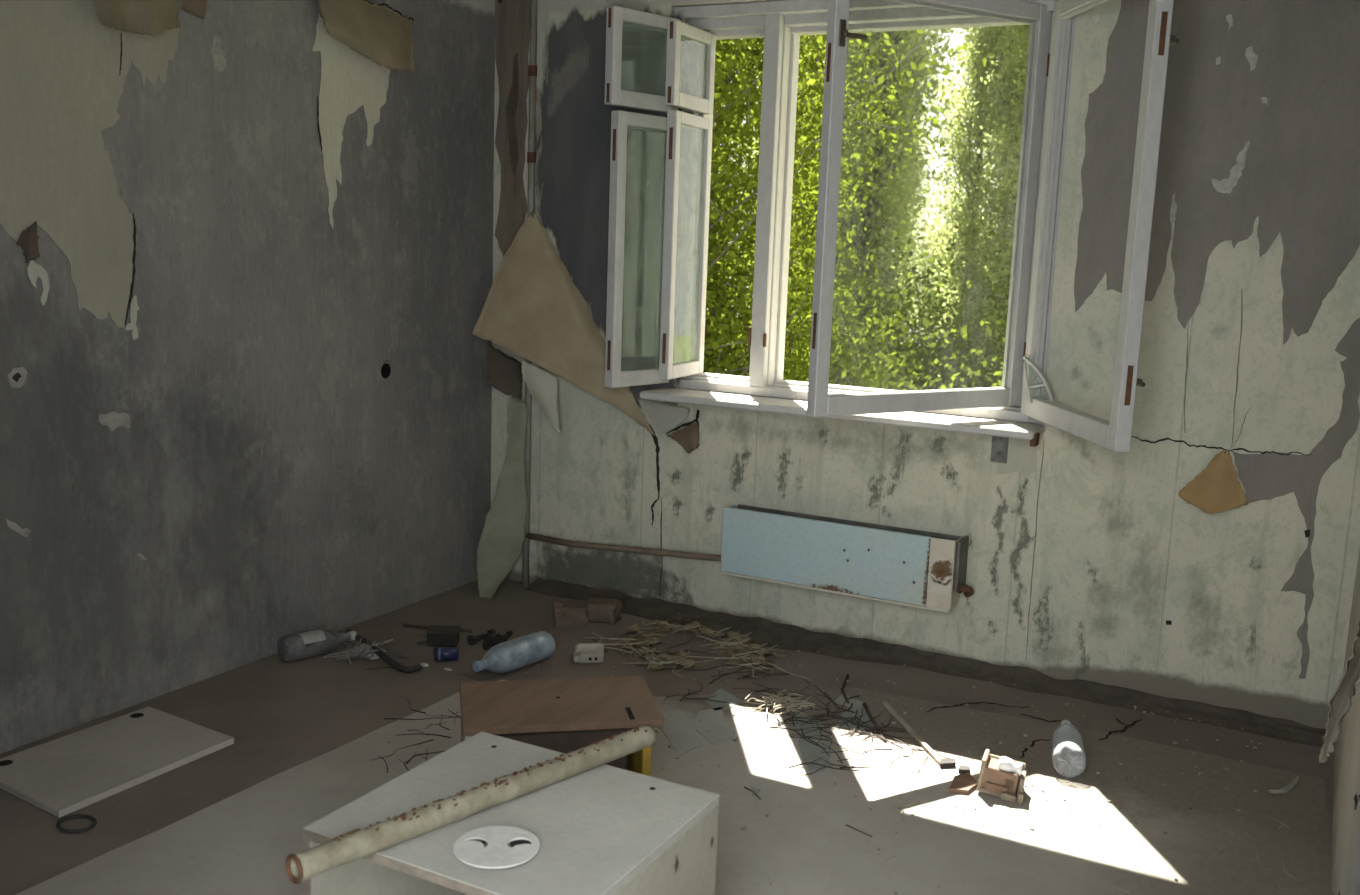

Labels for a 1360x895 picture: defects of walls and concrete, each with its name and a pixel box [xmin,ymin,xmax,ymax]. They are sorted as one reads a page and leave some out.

peeling [0,0,179,327]
peeling [312,14,390,228]
flaking render [1074,0,1150,312]
flaking render [1145,0,1360,345]
crack [1132,289,1311,455]
leakage [539,544,692,602]
crack [634,398,663,594]
leakage [732,451,751,491]
leakage [869,436,908,515]
leakage [991,480,1051,650]
flaking render [1232,318,1360,679]